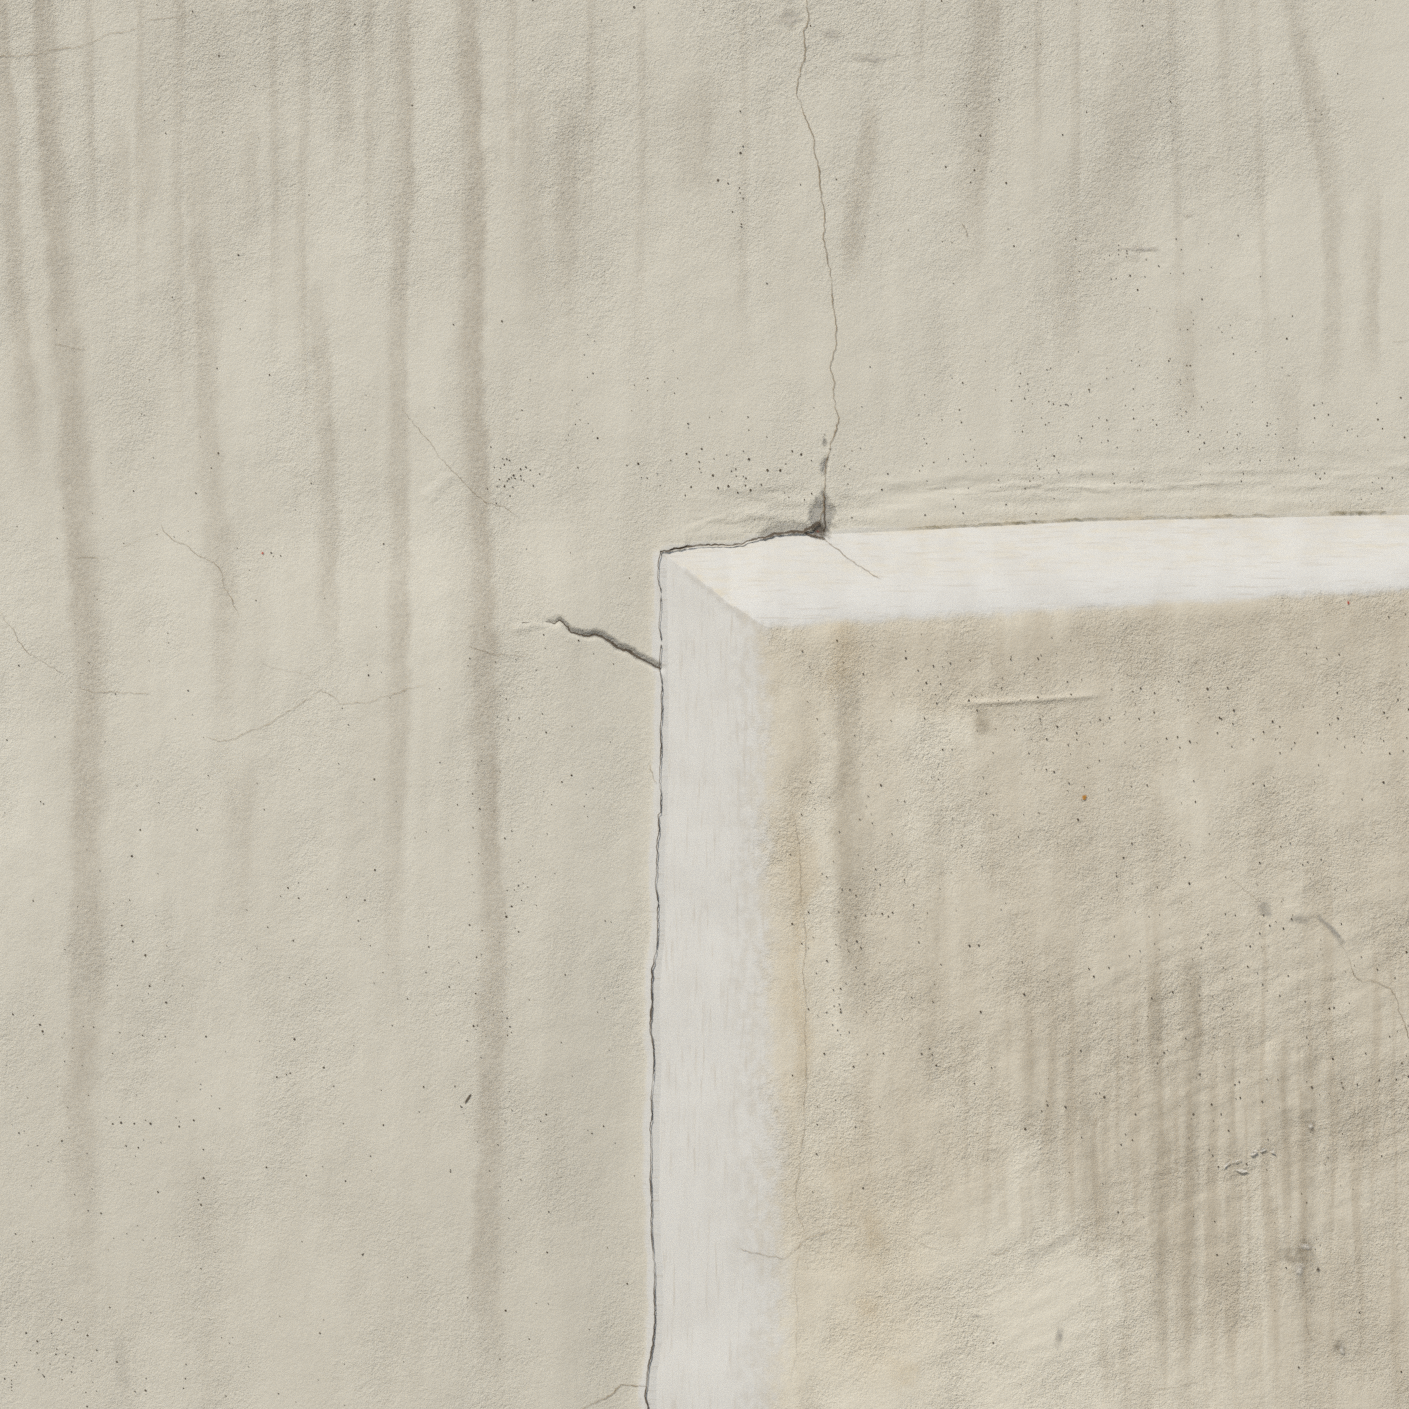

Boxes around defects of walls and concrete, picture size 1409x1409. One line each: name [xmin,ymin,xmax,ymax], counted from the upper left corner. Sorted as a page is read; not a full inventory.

crack [522,0,877,1409]